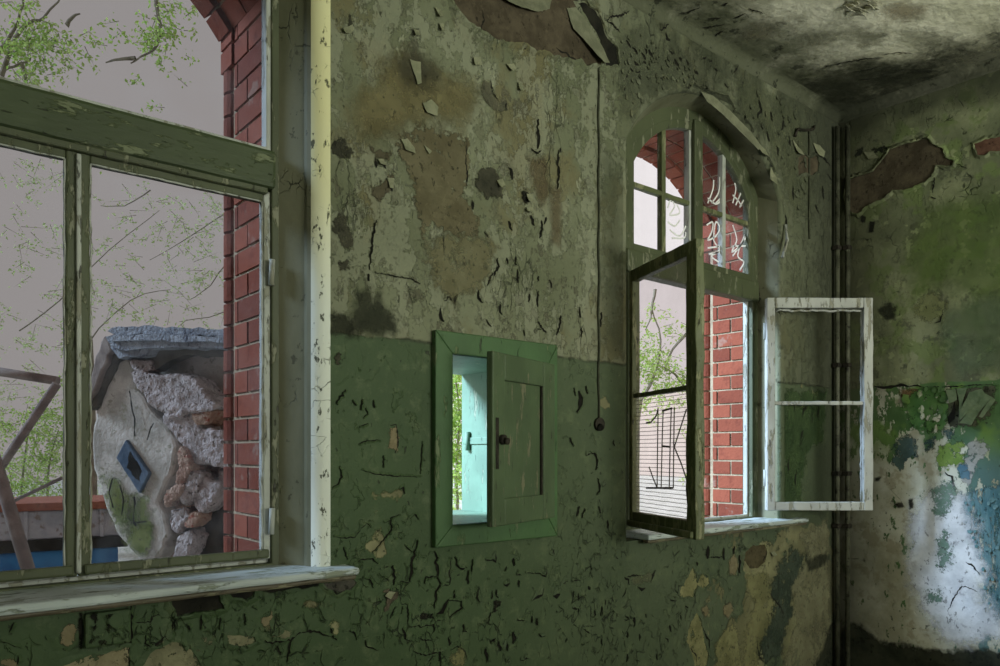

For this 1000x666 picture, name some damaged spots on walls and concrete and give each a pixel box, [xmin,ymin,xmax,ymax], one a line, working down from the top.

leakage [355,52,508,139]
spalling [435,0,621,73]
leakage [810,29,887,47]
leakage [801,47,1000,102]
crack [532,119,562,189]
spalling [840,135,966,218]
crack [368,220,421,284]
crack [439,217,603,337]
crack [332,389,689,666]
peeling [891,386,1000,622]
peeling [783,521,832,666]
leakage [816,491,1000,666]